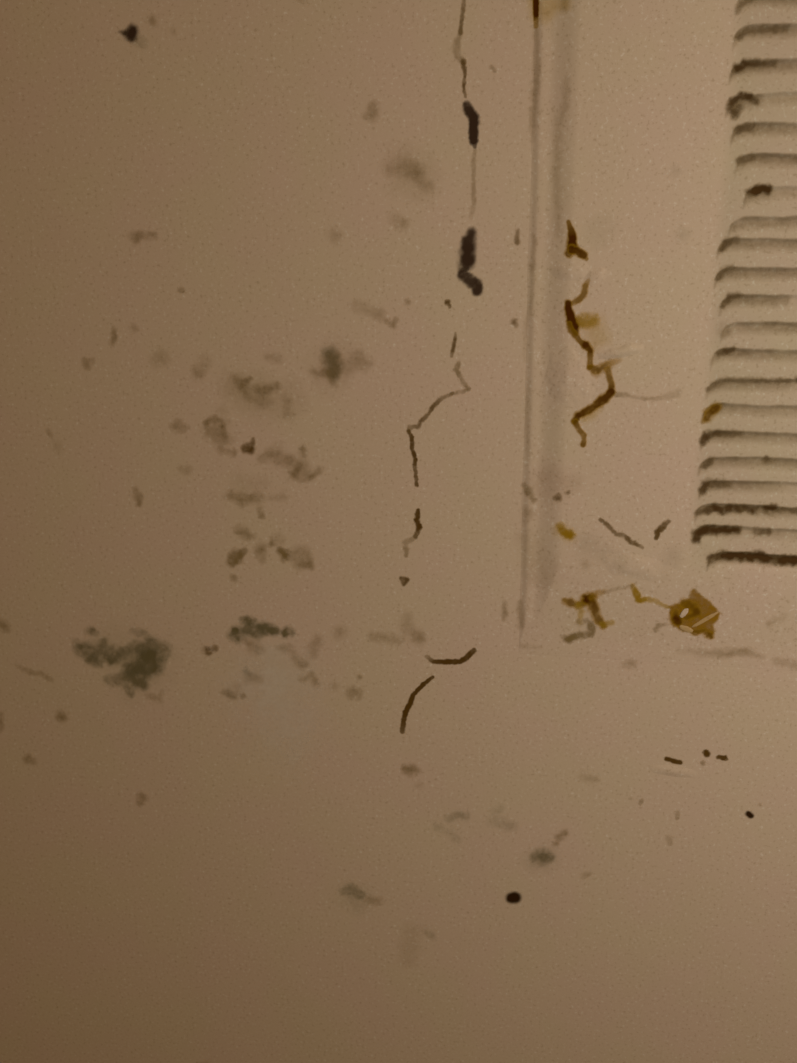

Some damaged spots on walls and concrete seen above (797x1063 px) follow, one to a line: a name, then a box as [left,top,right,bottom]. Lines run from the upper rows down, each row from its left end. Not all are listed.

crack [459,60,467,93]
crack [564,283,615,447]
crack [408,400,440,538]
crack [400,577,409,586]
mould [231,617,289,641]
rust [669,589,720,639]
mould [78,640,158,689]
crack [400,648,476,734]